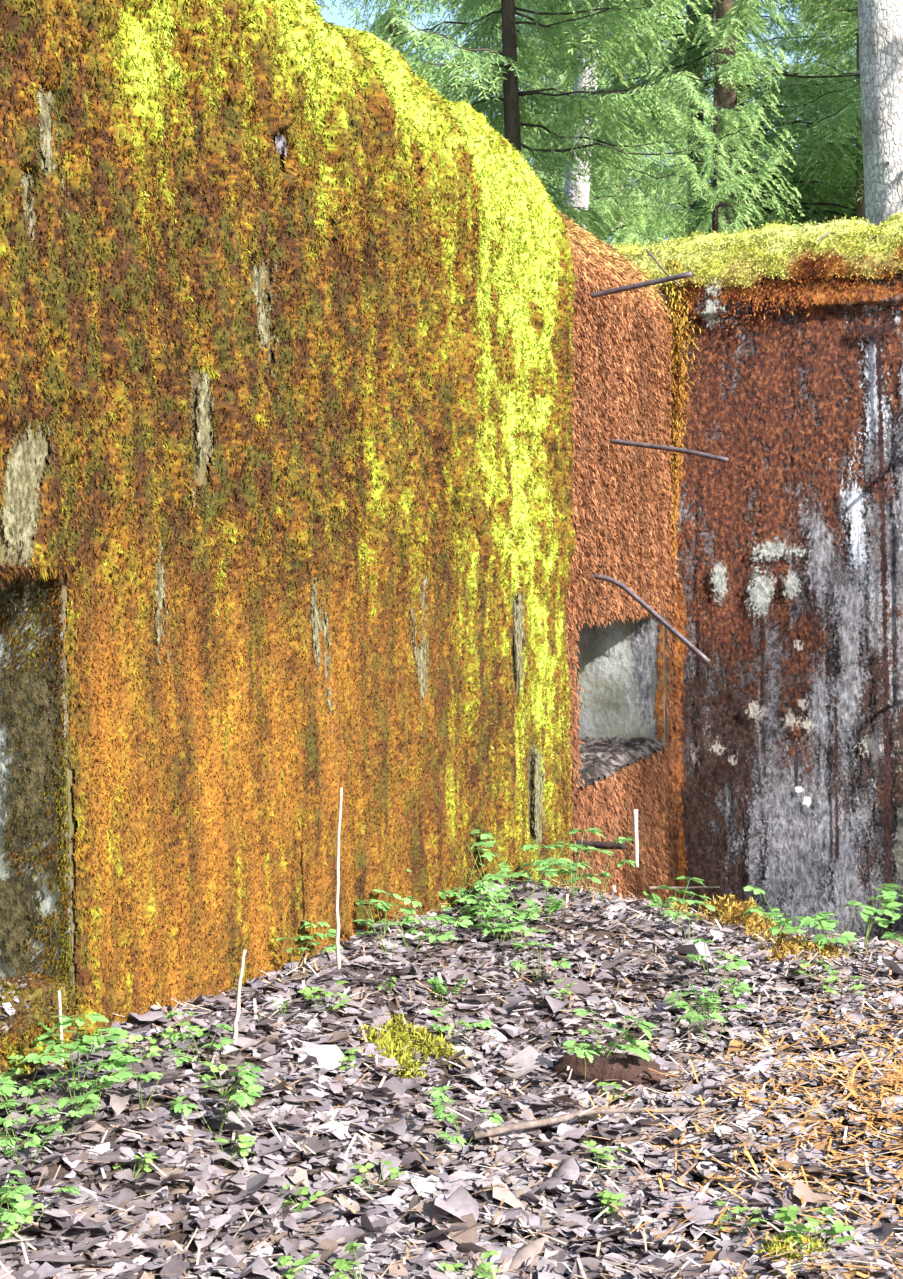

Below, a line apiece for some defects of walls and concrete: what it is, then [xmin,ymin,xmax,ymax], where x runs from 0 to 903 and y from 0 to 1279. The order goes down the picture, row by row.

leakage [629,619,660,739]
rust [654,275,903,940]
leakage [679,294,903,942]